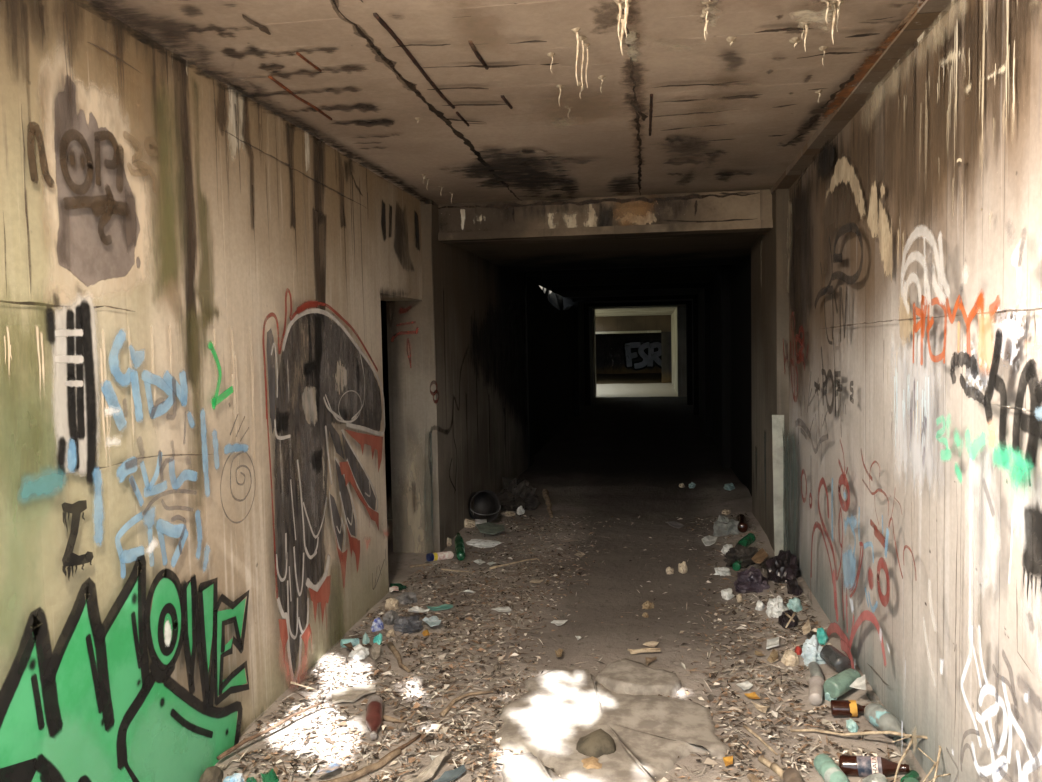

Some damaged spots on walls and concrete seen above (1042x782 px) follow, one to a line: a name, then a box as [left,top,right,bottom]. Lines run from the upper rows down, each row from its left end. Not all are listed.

crack [330,0,559,163]
crack [438,3,828,223]
water stain [777,0,837,33]
corrosion [778,0,925,147]
water stain [787,0,1039,335]